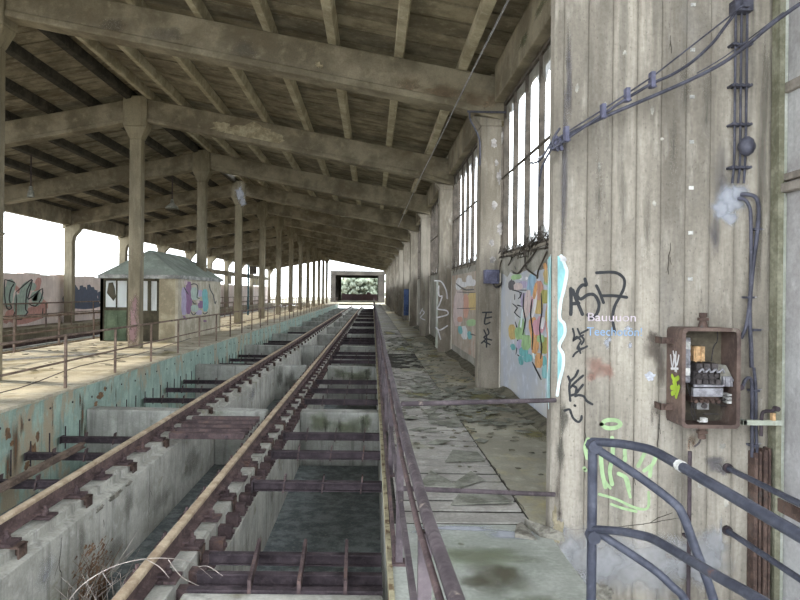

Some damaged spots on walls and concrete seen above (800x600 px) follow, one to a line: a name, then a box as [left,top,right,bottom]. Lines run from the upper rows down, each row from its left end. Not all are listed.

rust [6,418,23,479]
crack [481,452,525,510]
water stain [464,566,516,588]